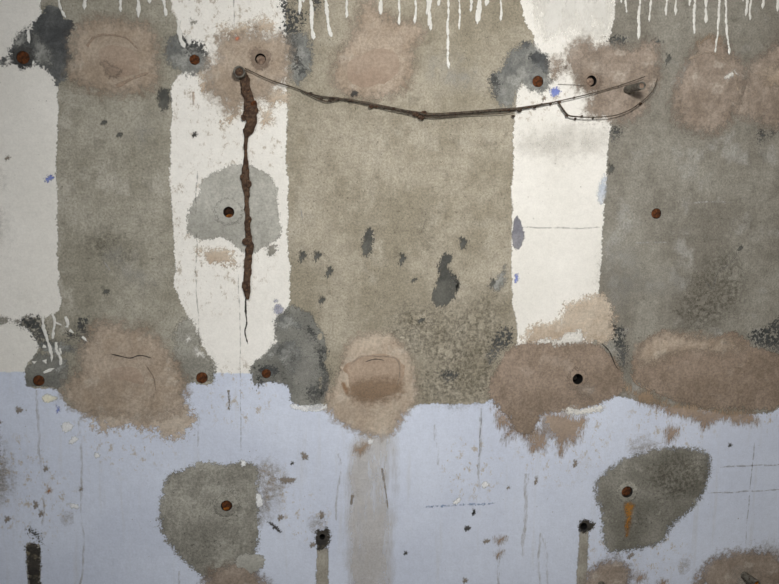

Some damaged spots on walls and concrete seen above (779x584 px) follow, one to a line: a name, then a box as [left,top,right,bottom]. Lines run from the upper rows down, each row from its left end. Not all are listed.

leakage [0,3,76,86]
leakage [164,34,210,77]
leakage [277,0,324,86]
leakage [489,40,553,112]
corrosion [240,72,259,300]
leakage [16,313,91,373]
leakage [249,305,333,412]
leakage [484,325,516,365]
leakage [611,324,630,368]
leakage [747,317,779,353]